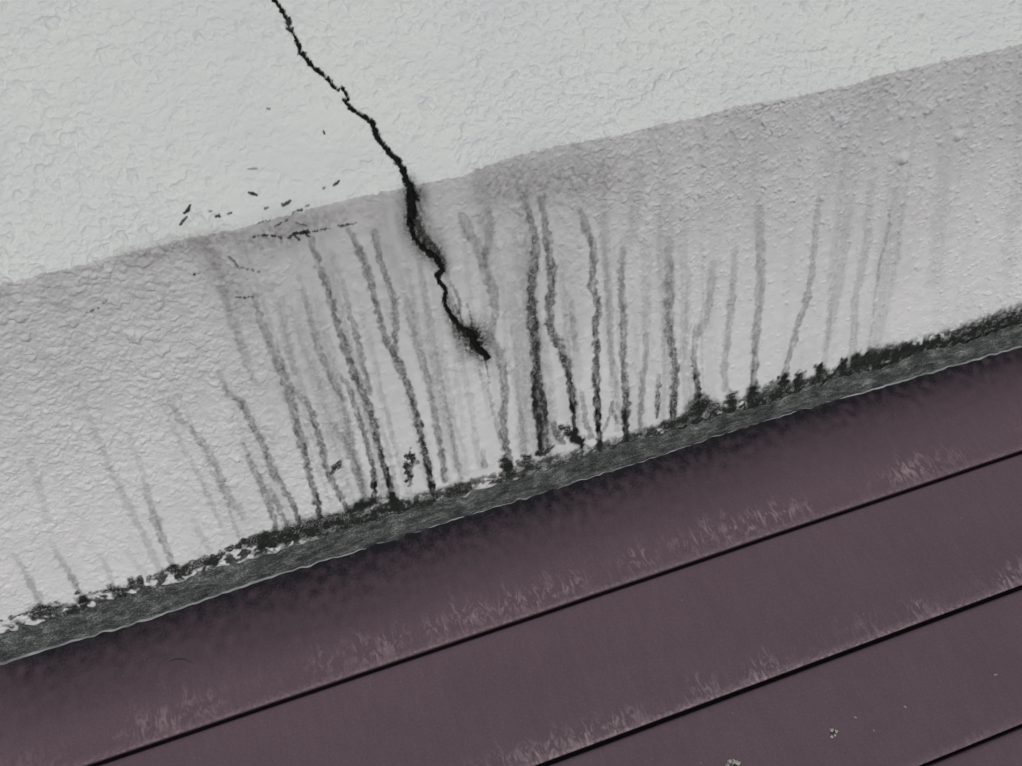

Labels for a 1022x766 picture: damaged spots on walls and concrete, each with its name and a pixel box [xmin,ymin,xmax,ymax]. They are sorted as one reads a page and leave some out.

crack [253,209,350,241]
crack [272,0,491,361]
damp [0,244,1022,633]